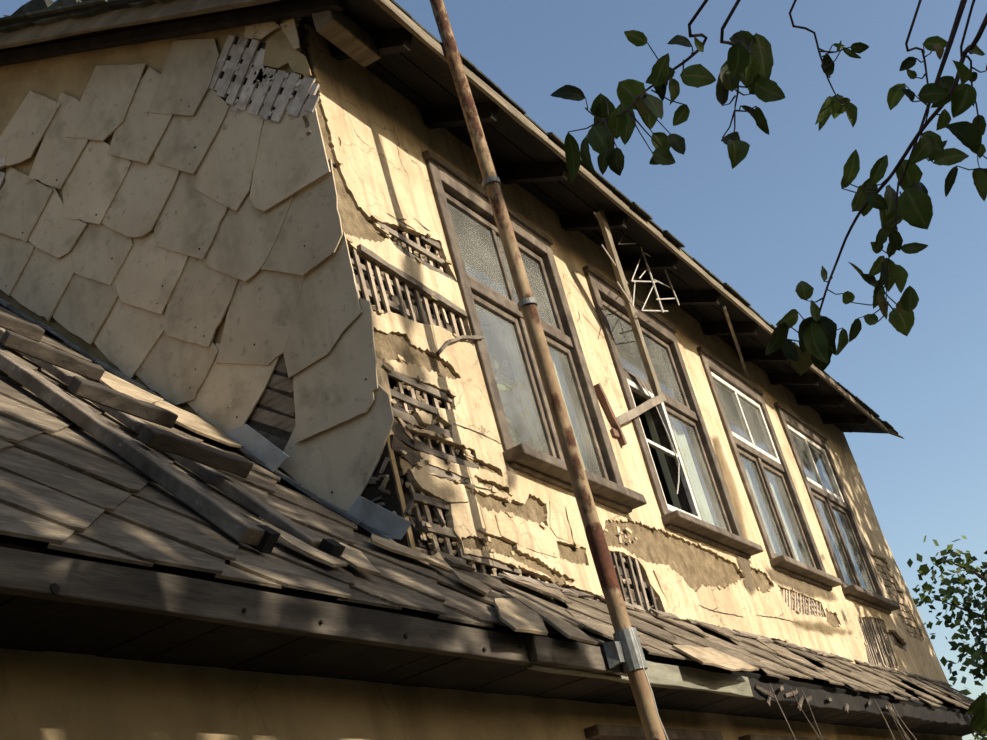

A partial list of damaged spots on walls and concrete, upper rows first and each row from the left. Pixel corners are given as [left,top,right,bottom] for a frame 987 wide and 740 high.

peeling [244,18,321,83]
spalling [302,102,391,243]
spalling [374,331,456,397]
spalling [604,517,795,593]
flaking render [870,552,924,651]